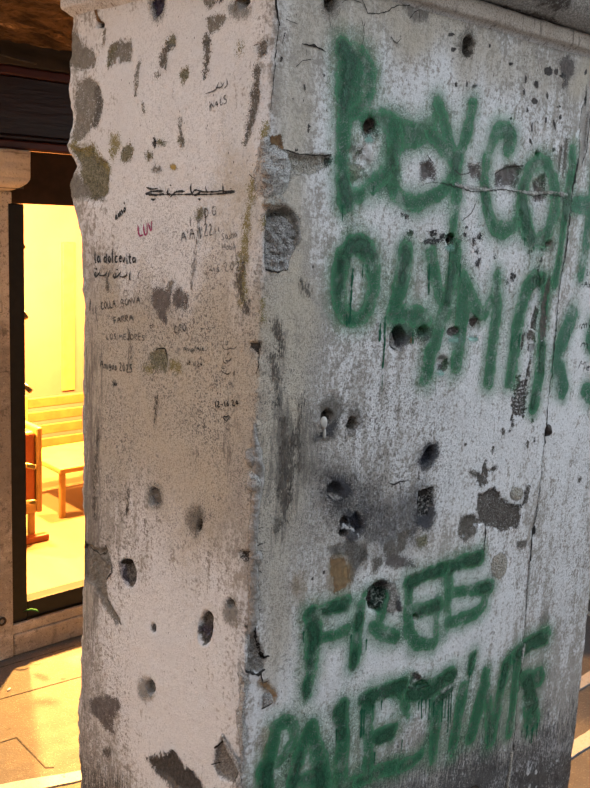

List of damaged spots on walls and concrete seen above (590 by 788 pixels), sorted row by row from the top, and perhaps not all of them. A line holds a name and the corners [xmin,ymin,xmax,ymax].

spalling [258,206,301,273]
crack [420,84,590,453]
peeling [501,278,551,436]
peeling [457,446,531,549]
spalling [84,540,122,626]
peeling [146,750,203,788]
spalling [211,625,270,788]
crack [506,472,543,788]